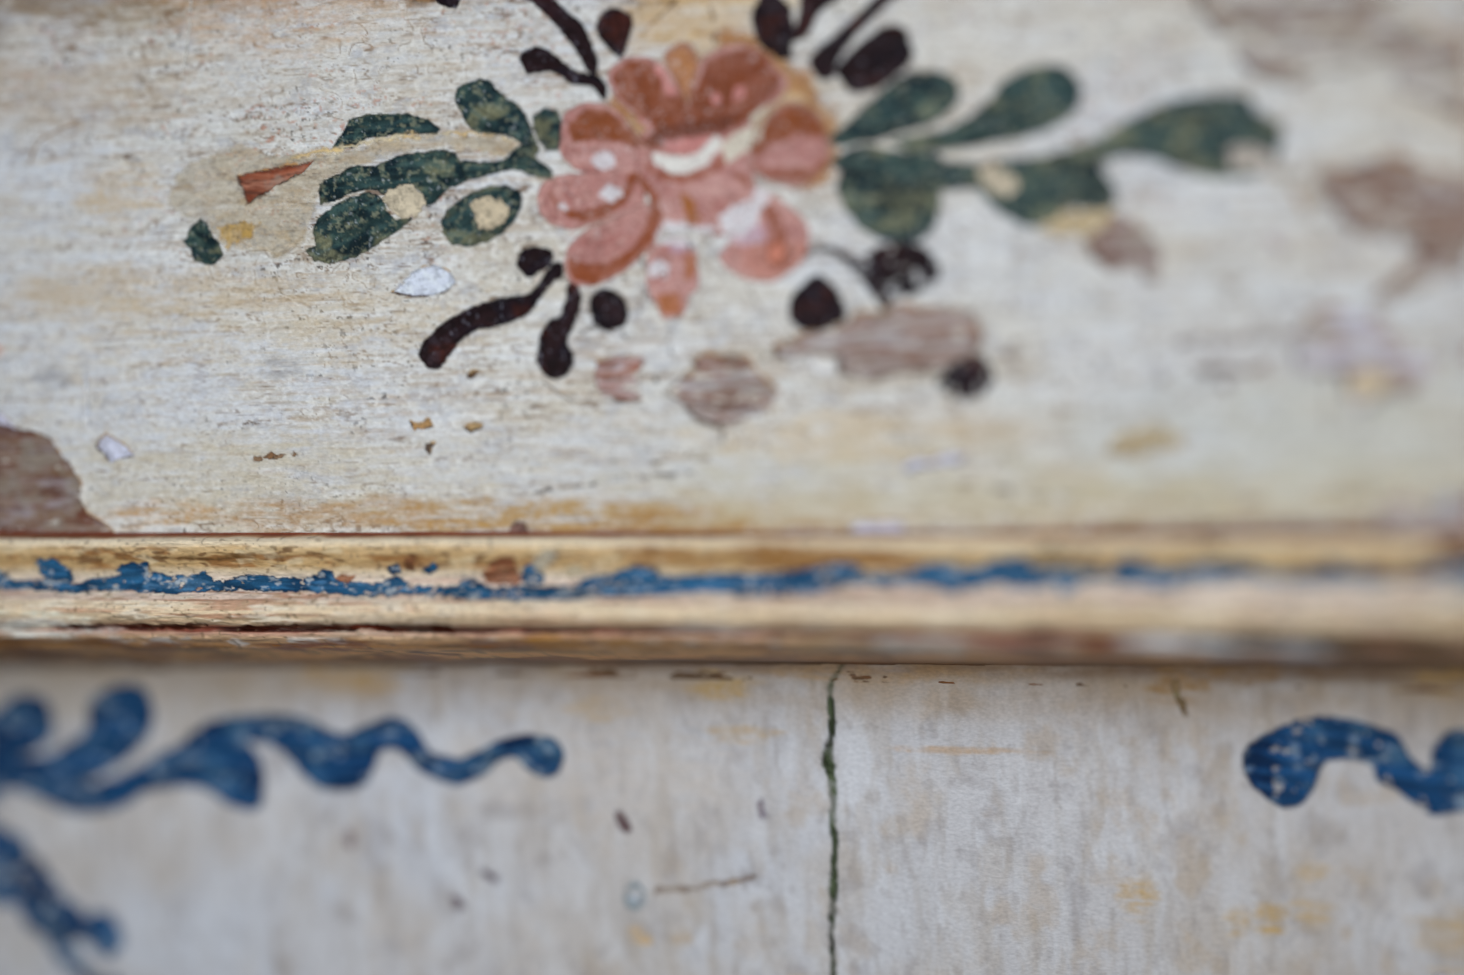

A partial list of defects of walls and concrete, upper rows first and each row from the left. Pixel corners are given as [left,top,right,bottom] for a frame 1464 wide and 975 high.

peeling [1197,0,1464,120]
peeling [1084,212,1161,282]
peeling [1281,154,1464,412]
peeling [594,356,645,403]
peeling [667,352,780,427]
peeling [772,302,983,381]
peeling [0,413,115,533]
peeling [1027,520,1381,571]
crack [822,682,838,975]